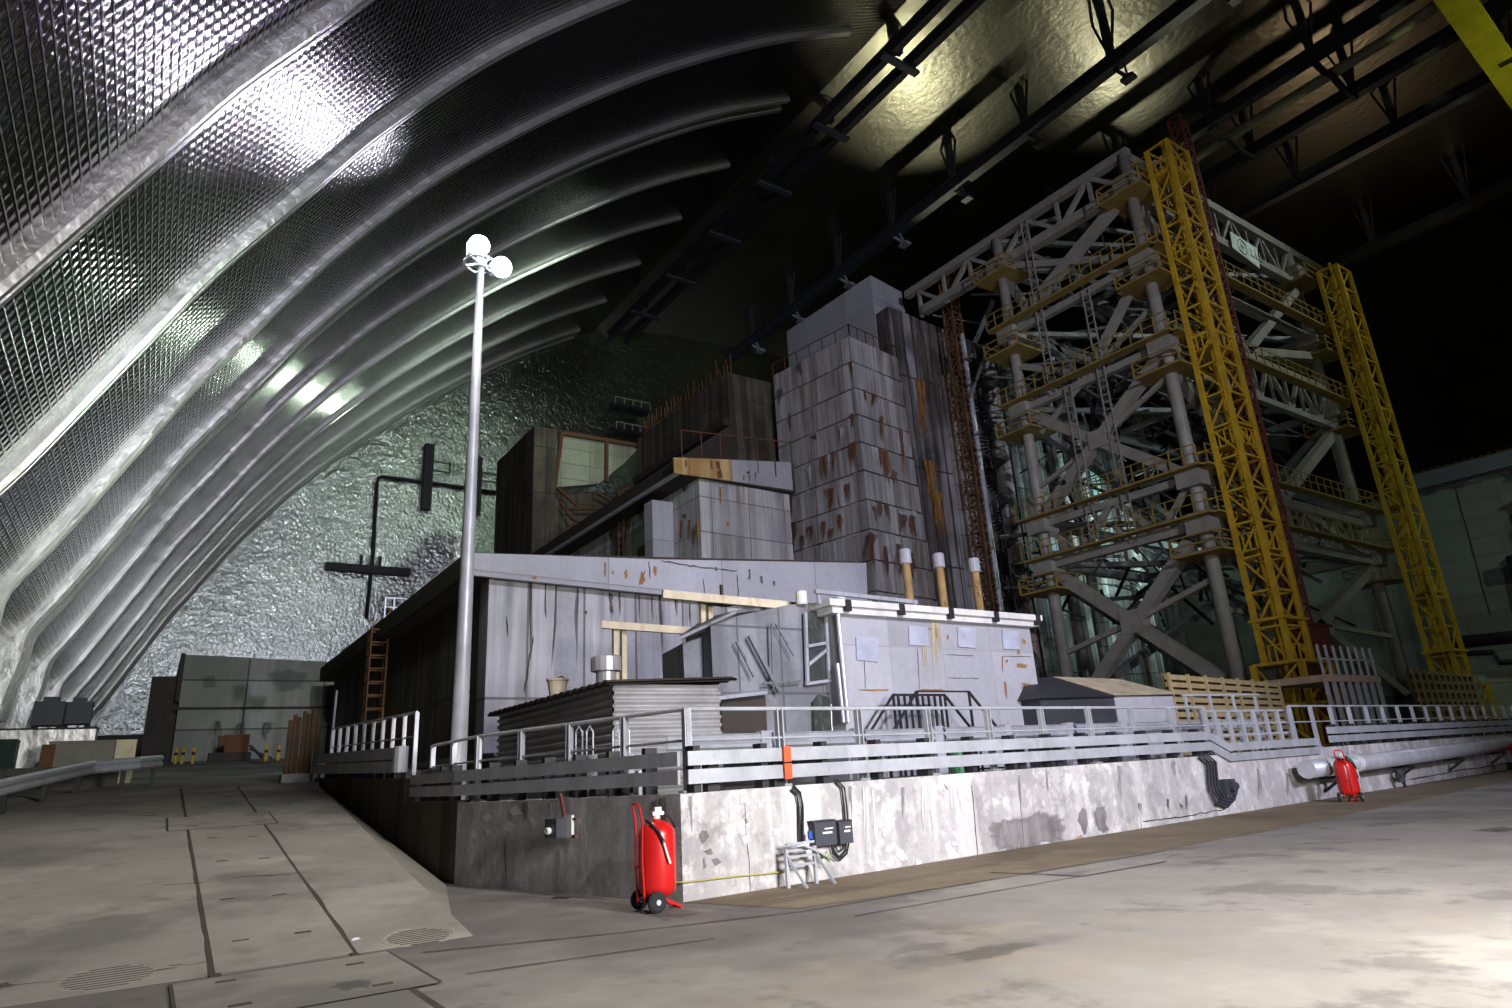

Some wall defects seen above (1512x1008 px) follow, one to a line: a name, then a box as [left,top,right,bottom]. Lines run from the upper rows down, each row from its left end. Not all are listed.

rust [864,390,904,482]
rust [789,413,856,546]
rust [924,459,944,528]
rust [604,562,657,585]
rust [868,500,916,578]